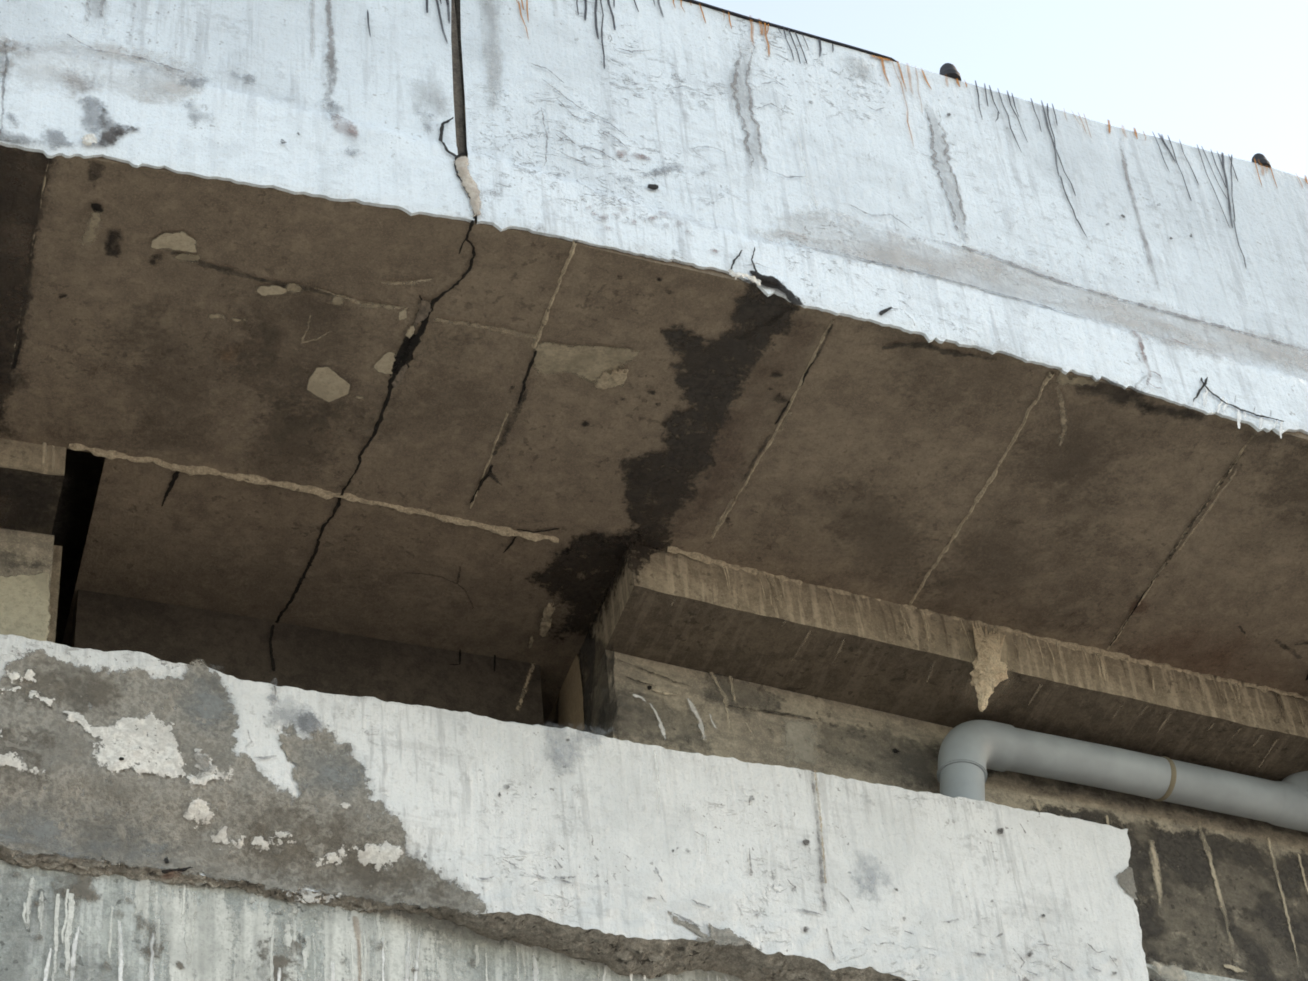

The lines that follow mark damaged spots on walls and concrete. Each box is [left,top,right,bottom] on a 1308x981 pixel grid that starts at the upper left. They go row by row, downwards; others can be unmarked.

rust [750,16,770,56]
rust [872,55,931,89]
spalling [150,231,200,265]
spalling [307,367,364,402]
crack [179,117,537,671]
crack [161,471,180,507]
damp [525,275,799,642]
damp [545,654,585,731]
peeling [0,649,488,918]
damp [22,878,79,981]
damp [127,879,488,981]
spalling [668,911,760,950]